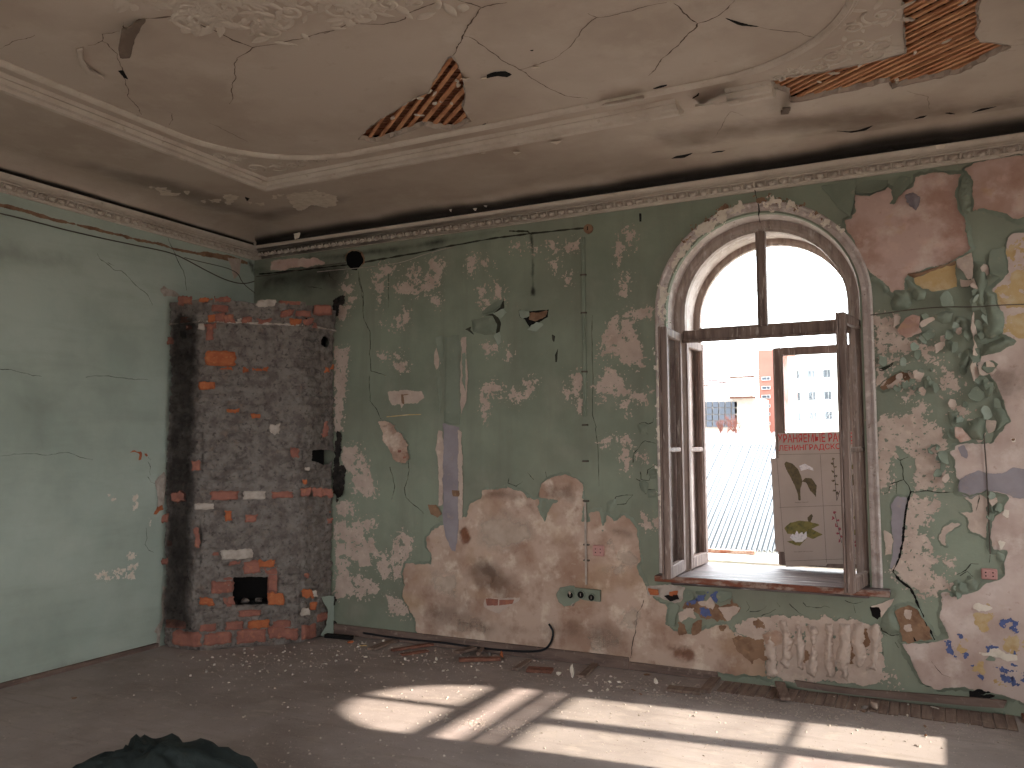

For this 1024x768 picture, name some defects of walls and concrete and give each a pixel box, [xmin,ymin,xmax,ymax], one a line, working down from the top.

flaking render [358,56,471,142]
crack [201,0,735,140]
flaking render [772,0,1011,103]
peeling [201,189,338,211]
peeling [336,267,360,326]
peeling [367,253,447,333]
peeling [462,251,543,331]
peeling [559,223,671,478]
flaking render [668,154,1024,705]
spalling [149,472,167,526]
flaking render [331,332,774,683]
crack [884,457,949,677]